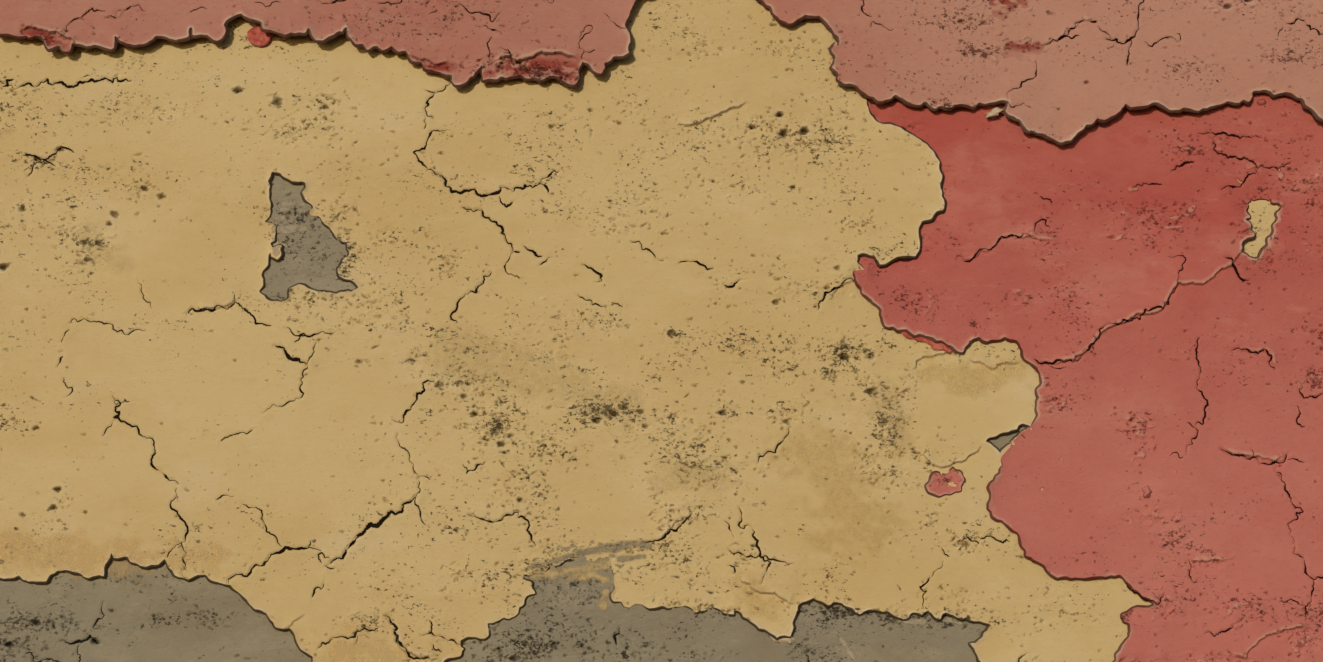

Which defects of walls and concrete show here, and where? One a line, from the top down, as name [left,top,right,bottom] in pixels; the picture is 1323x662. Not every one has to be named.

peeling [0,0,632,88]
flaking render [260,174,359,309]
crack [413,82,559,322]
peeling [770,8,1323,472]
crack [103,397,189,579]
crack [188,294,333,441]
crack [216,379,435,597]
crack [318,615,460,660]
flaking render [0,448,1010,662]
spalling [540,387,660,433]
peeling [987,471,1138,592]
crack [1171,338,1323,617]